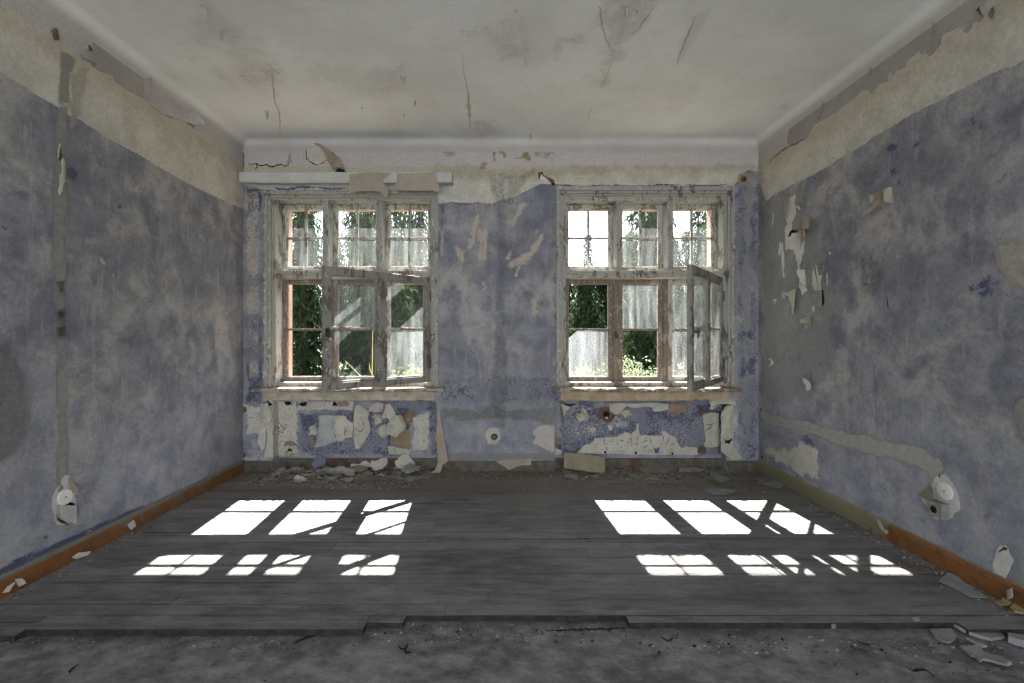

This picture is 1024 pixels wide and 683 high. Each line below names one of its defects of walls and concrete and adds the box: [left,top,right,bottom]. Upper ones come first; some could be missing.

peeling [57,143,66,195]
crack [243,64,348,190]
peeling [258,190,438,450]
flaking render [538,169,743,460]
peeling [772,195,828,330]
peeling [856,187,893,221]